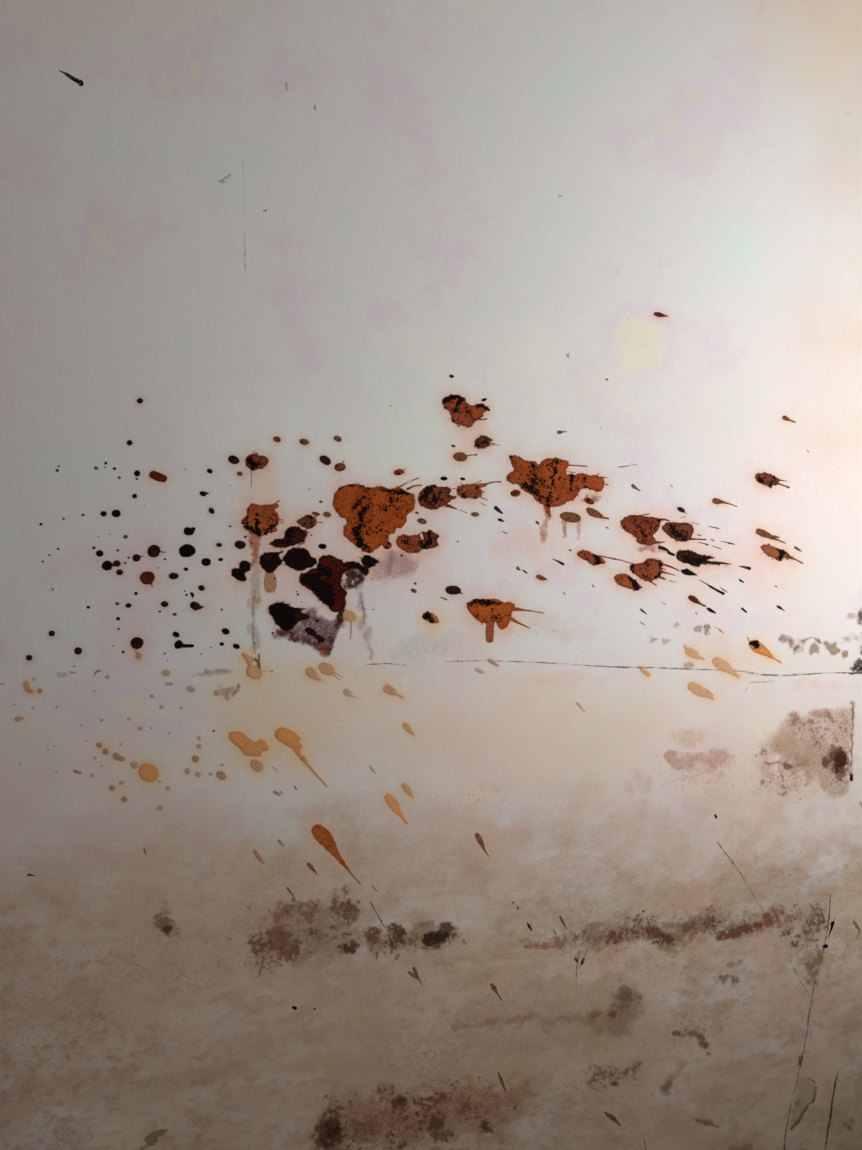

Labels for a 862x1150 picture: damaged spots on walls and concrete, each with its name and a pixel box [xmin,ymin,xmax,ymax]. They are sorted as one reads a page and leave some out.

water stain [765,702,854,794]
water stain [249,889,464,971]
water stain [524,905,827,948]
water stain [672,1029,710,1054]
water stain [312,1095,358,1150]
water stain [370,1085,493,1149]